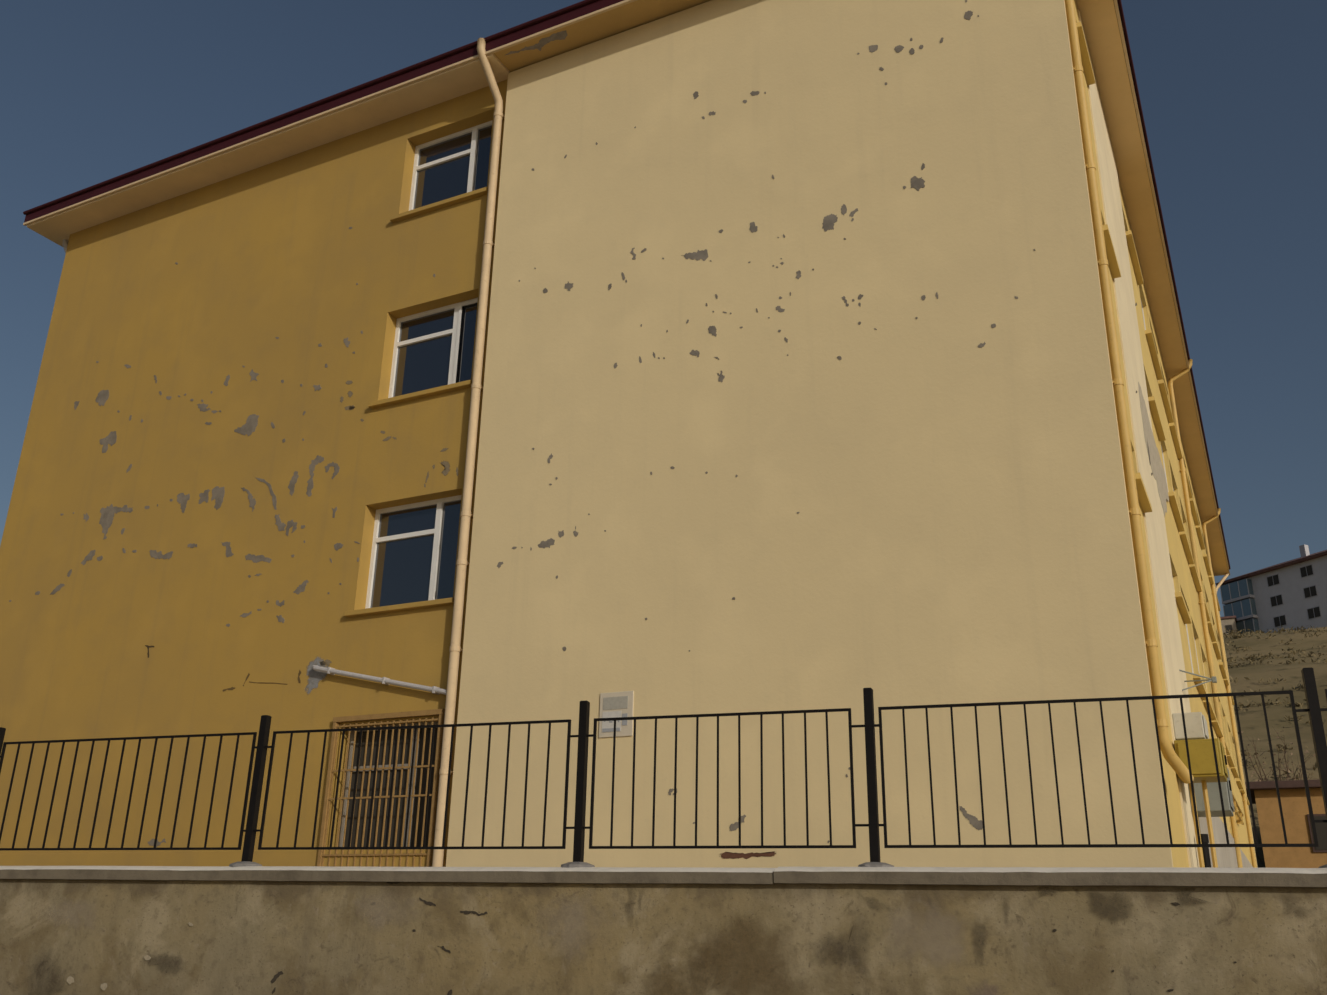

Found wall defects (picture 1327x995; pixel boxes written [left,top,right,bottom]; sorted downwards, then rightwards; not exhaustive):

peeling [903,163,925,191]
peeling [822,204,858,240]
peeling [681,249,711,261]
peeling [756,258,814,356]
peeling [154,365,259,425]
peeling [100,431,117,453]
peeling [234,414,286,443]
peeling [241,455,340,543]
peeling [35,486,225,595]
peeling [221,542,272,578]
peeling [226,580,309,627]
peeling [960,806,983,830]